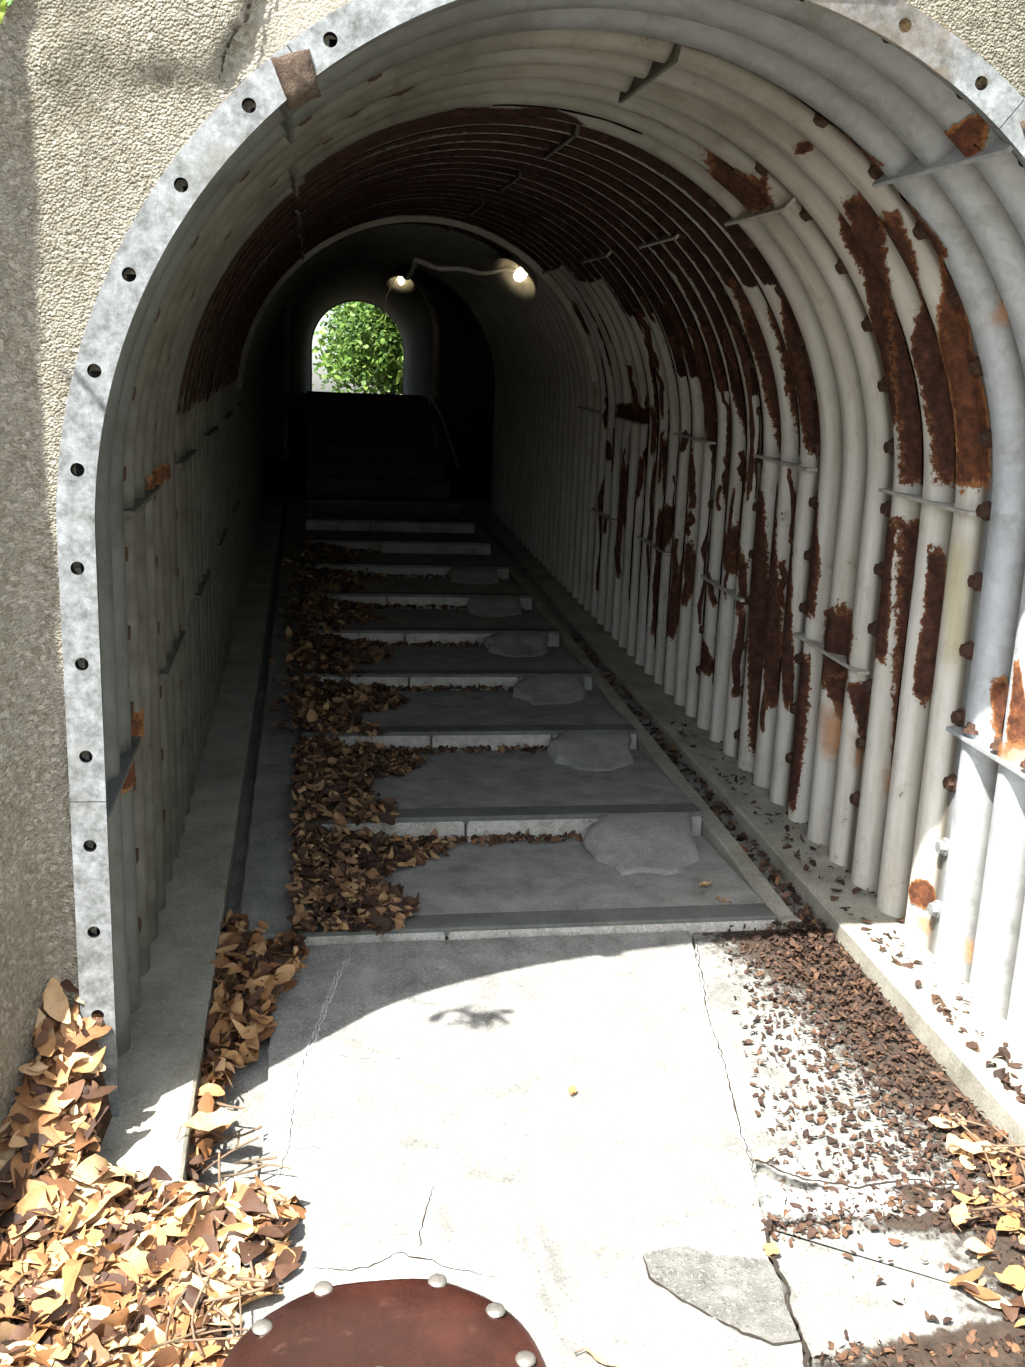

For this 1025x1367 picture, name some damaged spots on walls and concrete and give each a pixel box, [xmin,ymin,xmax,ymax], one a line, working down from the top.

crack [190,0,253,81]
corrosion [944,114,990,157]
corrosion [838,189,992,494]
corrosion [177,104,870,813]
corrosion [873,516,947,787]
corrosion [989,659,1025,761]
corrosion [908,876,937,931]
crack [273,948,355,1186]
crack [314,1185,494,1279]
crack [643,1225,811,1367]